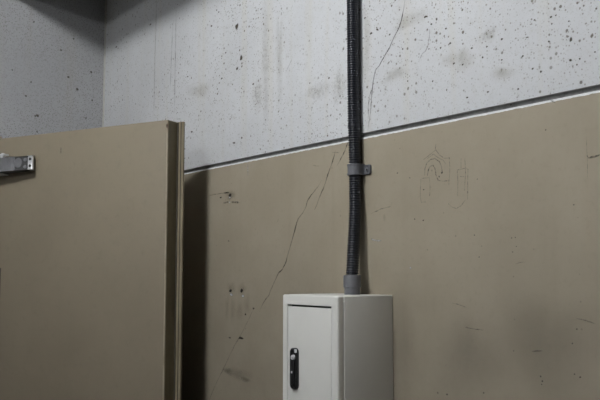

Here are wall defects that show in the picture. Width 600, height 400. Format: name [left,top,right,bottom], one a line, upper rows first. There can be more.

crack [368,10,404,105]